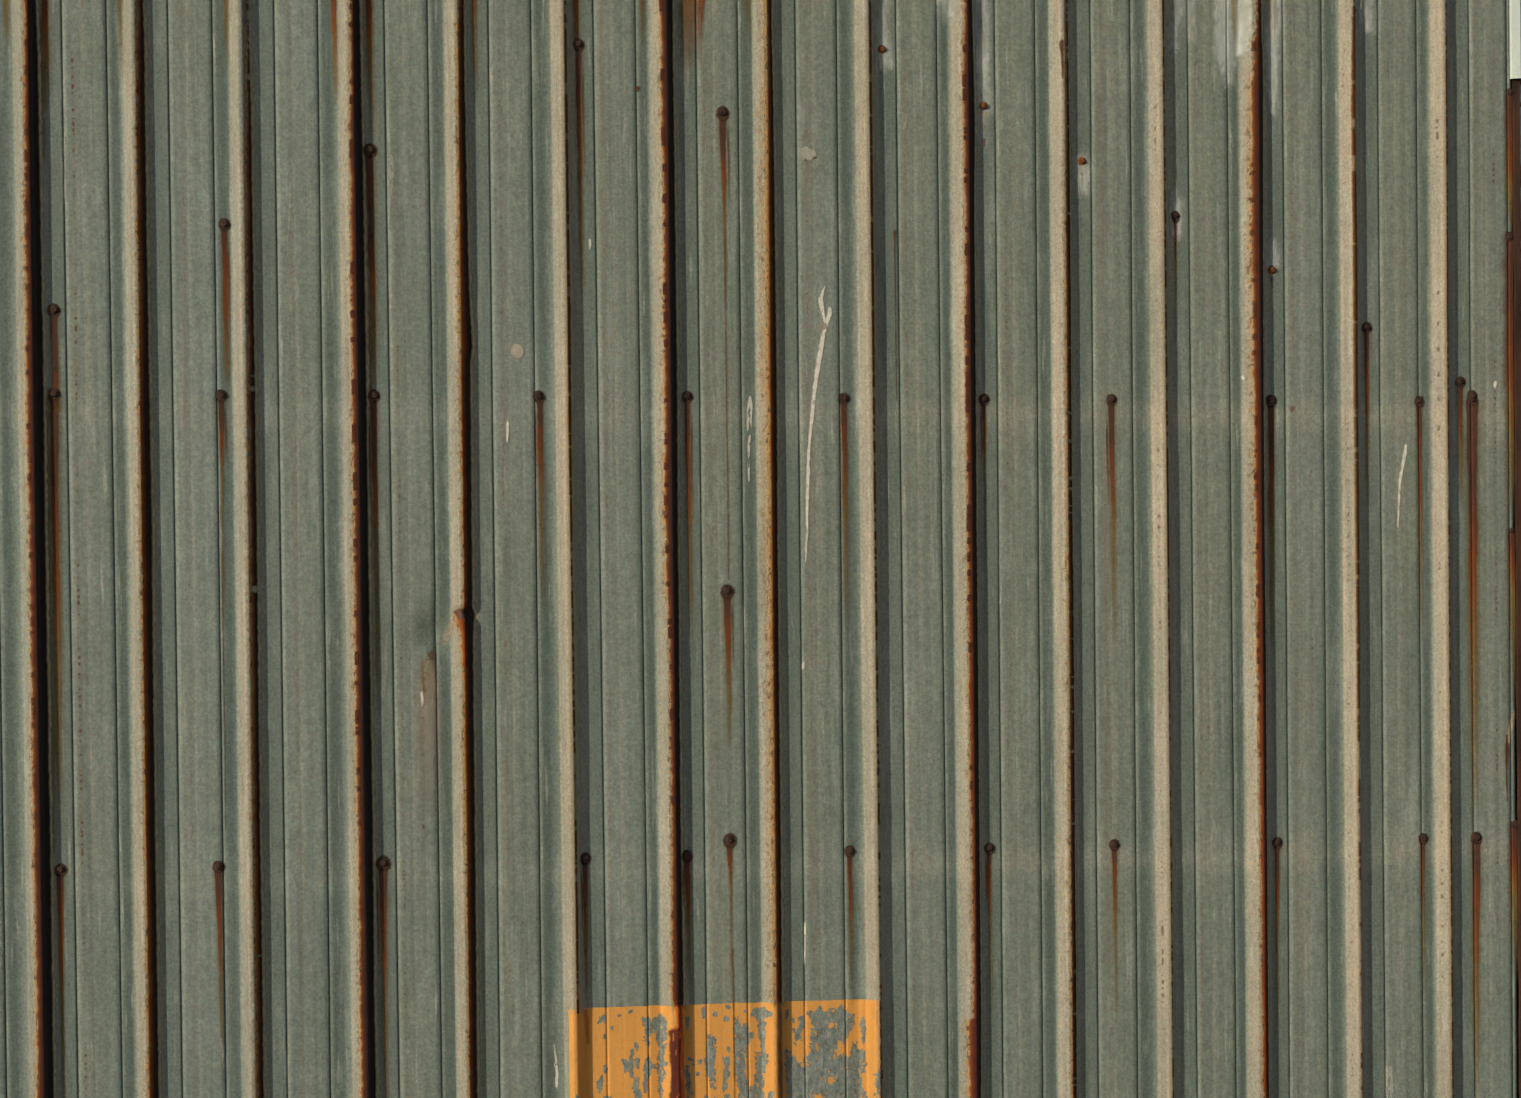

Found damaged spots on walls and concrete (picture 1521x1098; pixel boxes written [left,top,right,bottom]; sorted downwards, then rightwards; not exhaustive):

rust [4,0,83,1098]
rust [118,0,162,1098]
rust [216,0,267,1098]
rust [331,0,406,1098]
rust [454,0,480,1098]
rust [640,0,704,1098]
peeling [596,1004,883,1098]
rust [745,0,785,1098]
rust [962,0,995,1098]
rust [1059,0,1078,1098]
rust [1247,0,1295,1098]
rust [1445,3,1521,1098]